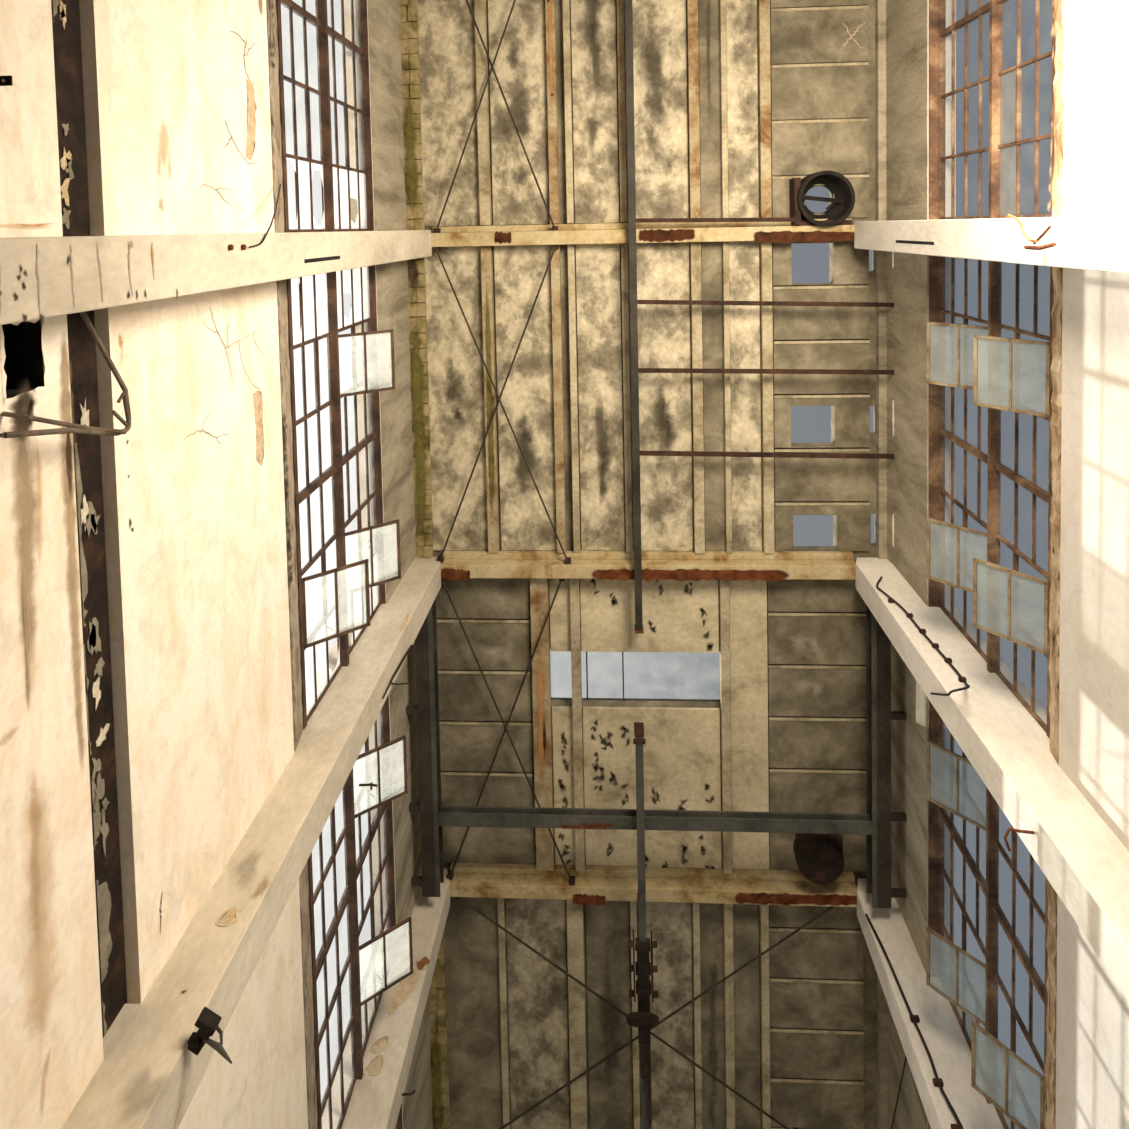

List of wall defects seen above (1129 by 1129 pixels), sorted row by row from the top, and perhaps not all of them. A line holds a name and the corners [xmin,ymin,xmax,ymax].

crack [231,31,257,85]
water stain [586,0,599,77]
peeling [60,123,74,229]
crack [204,308,267,389]
crack [183,410,230,445]
water stain [12,400,36,700]
spalling [0,312,131,858]
water stain [61,345,83,752]
rust [441,568,470,581]
rust [592,568,789,581]
peeling [96,880,112,982]
rust [736,893,857,906]